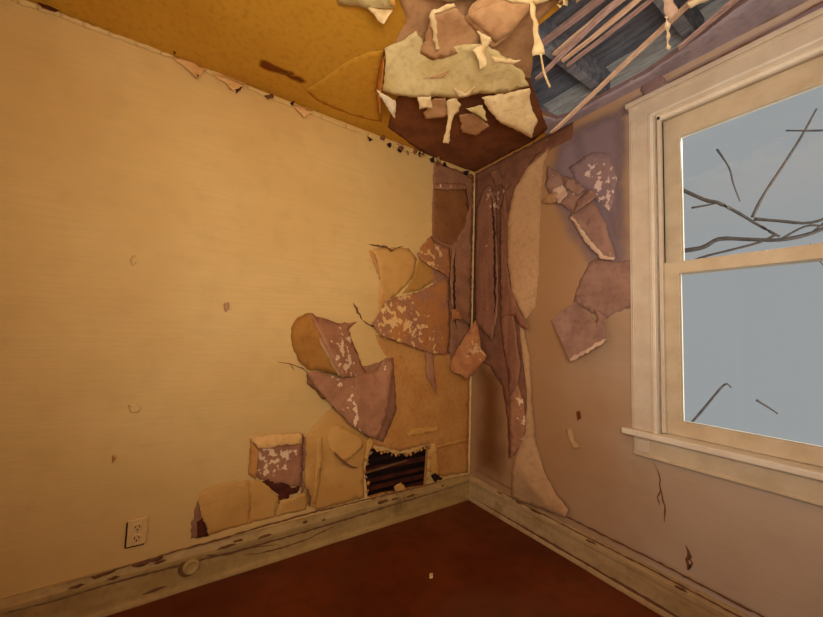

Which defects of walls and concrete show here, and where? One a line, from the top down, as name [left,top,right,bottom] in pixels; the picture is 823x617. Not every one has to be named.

peeling [305,0,809,458]
flaking render [62,334,470,585]
crack [653,462,666,522]
peeling [11,564,182,612]
crack [472,497,679,617]
crack [685,545,693,570]